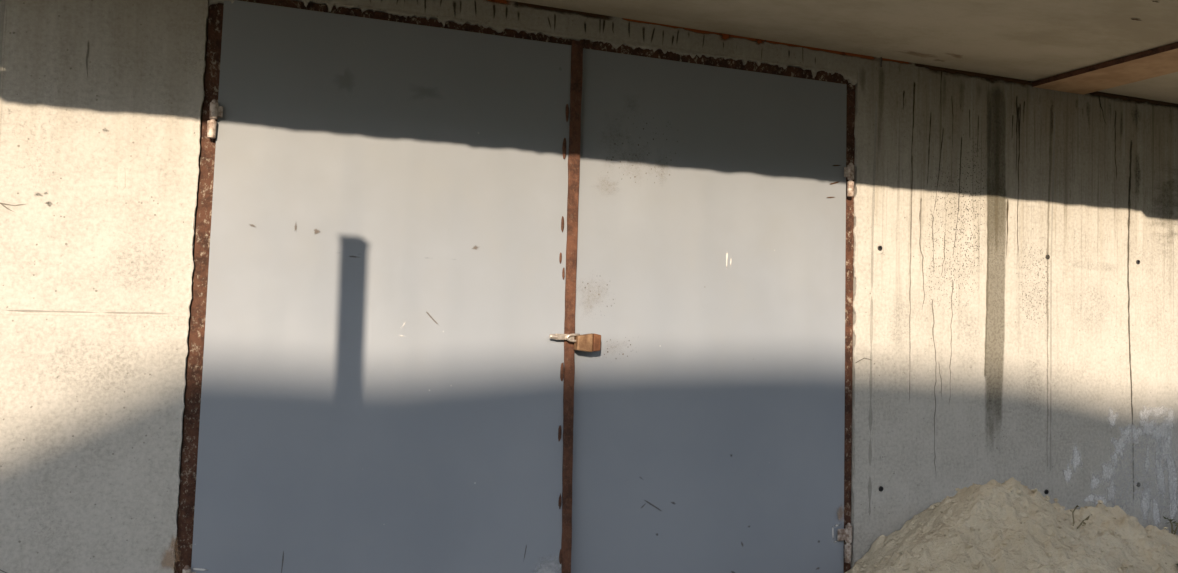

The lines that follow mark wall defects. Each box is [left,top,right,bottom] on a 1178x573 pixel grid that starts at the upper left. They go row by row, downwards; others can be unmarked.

rust [486,0,1032,86]
water stain [926,94,1048,415]
crack [1099,97,1134,498]
water stain [1084,406,1178,526]